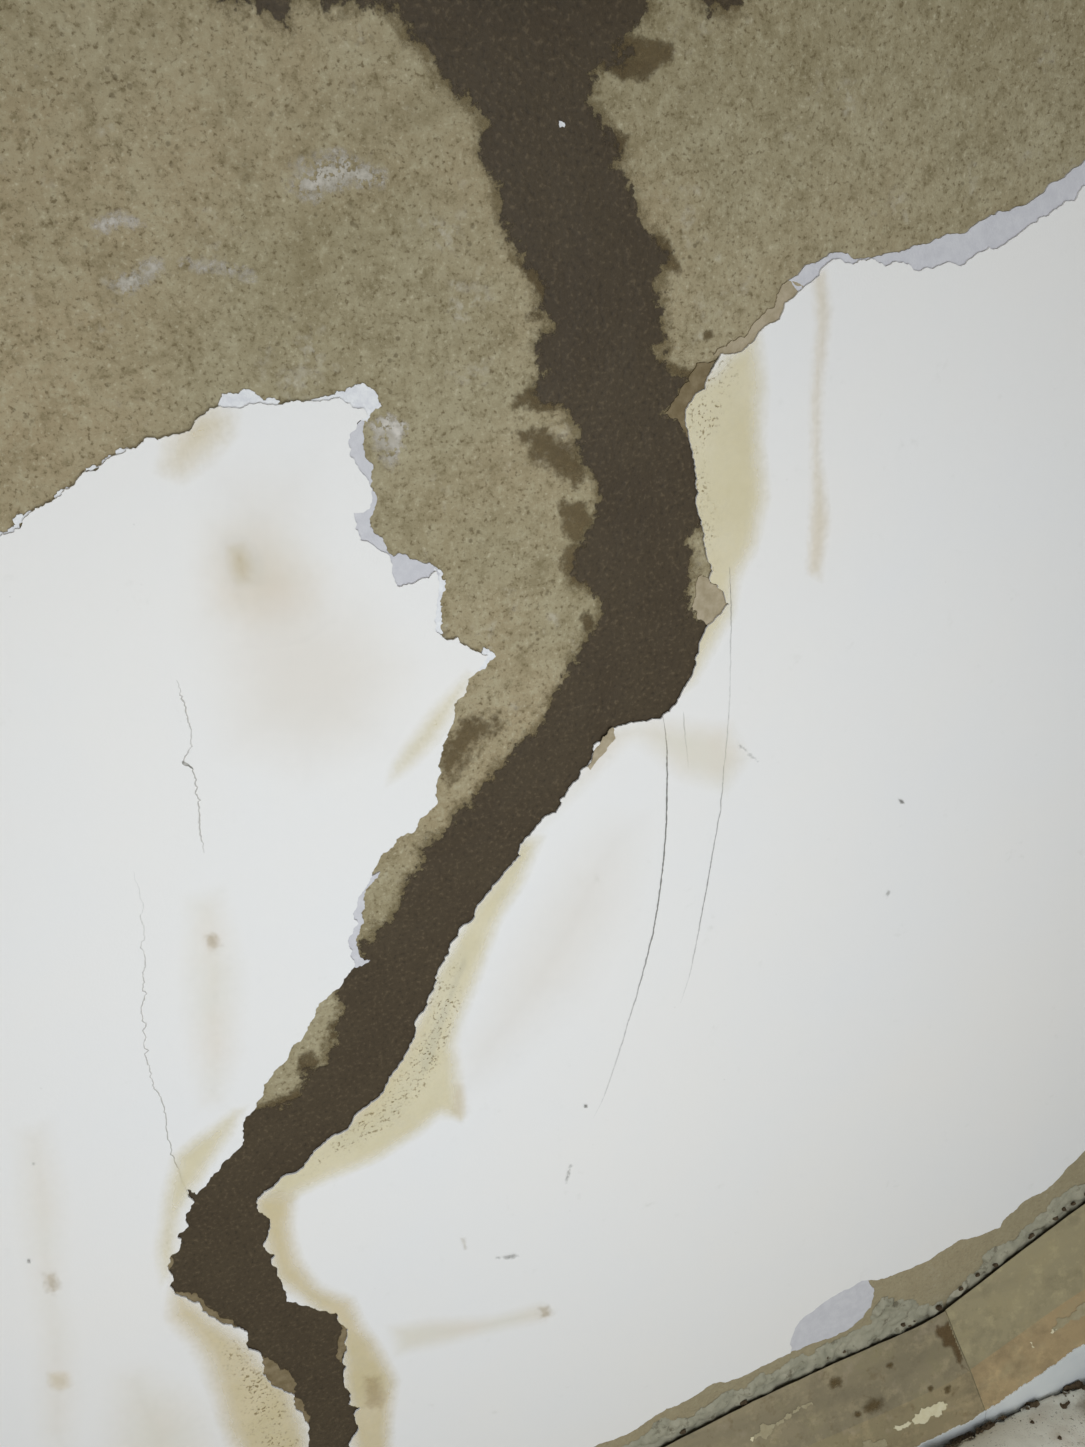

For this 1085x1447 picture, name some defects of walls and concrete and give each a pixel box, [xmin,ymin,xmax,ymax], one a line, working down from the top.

leakage [702,0,744,19]
peeling [586,0,1085,437]
peeling [0,0,603,968]
peeling [684,527,728,625]
crack [182,756,204,845]
leakage [169,0,707,1447]
peeling [587,727,616,770]
peeling [253,990,343,1112]
crack [153,1082,189,1196]
peeling [175,1292,238,1327]
peeling [595,1151,1085,1447]
peeling [262,1356,311,1424]